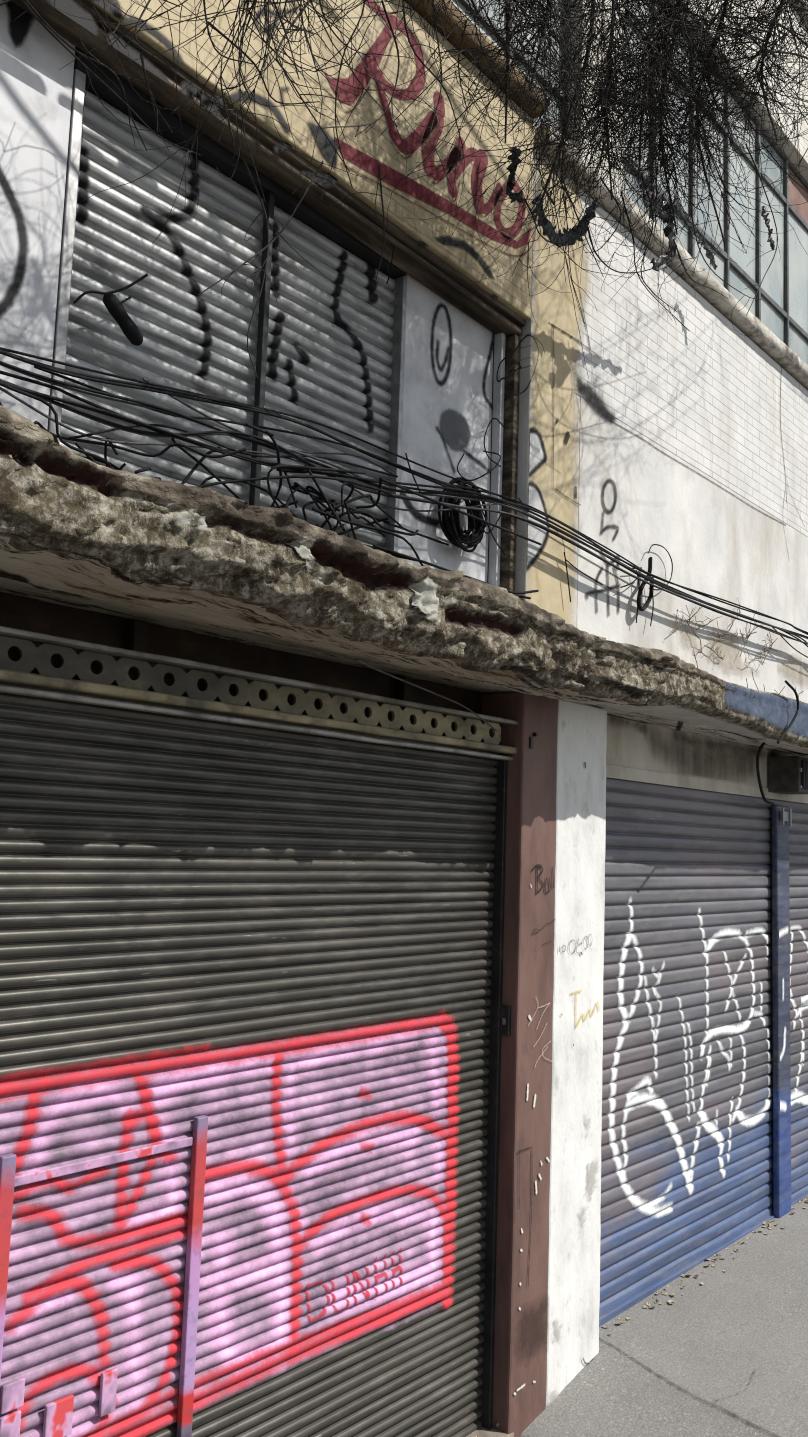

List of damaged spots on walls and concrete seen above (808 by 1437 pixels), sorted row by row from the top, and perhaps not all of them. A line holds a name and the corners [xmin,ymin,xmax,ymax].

spalling [0,434,119,496]
spalling [0,571,28,583]
spalling [175,511,523,637]
peeling [784,659,808,682]